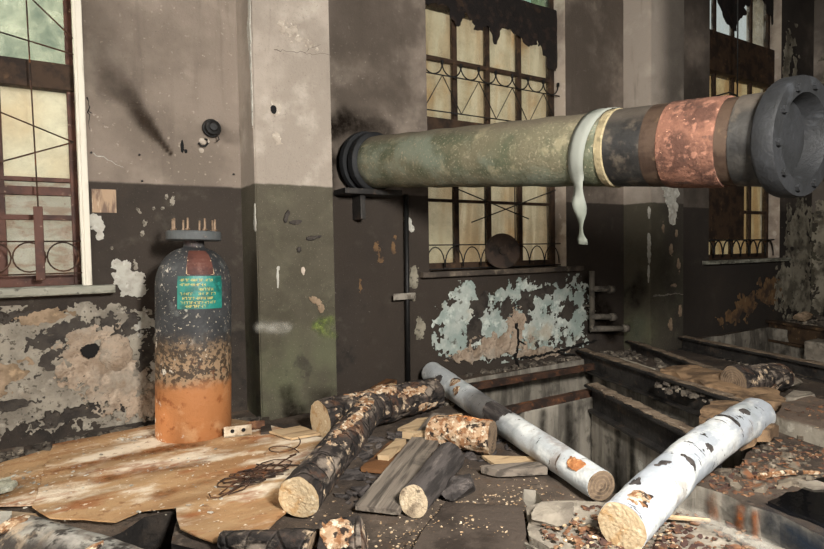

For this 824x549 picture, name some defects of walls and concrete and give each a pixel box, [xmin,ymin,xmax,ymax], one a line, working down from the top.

leakage [128,98,172,155]
rust [655,95,734,188]
peeling [90,213,105,240]
peeling [0,246,155,441]
peeling [409,265,419,289]
peeling [414,273,589,365]